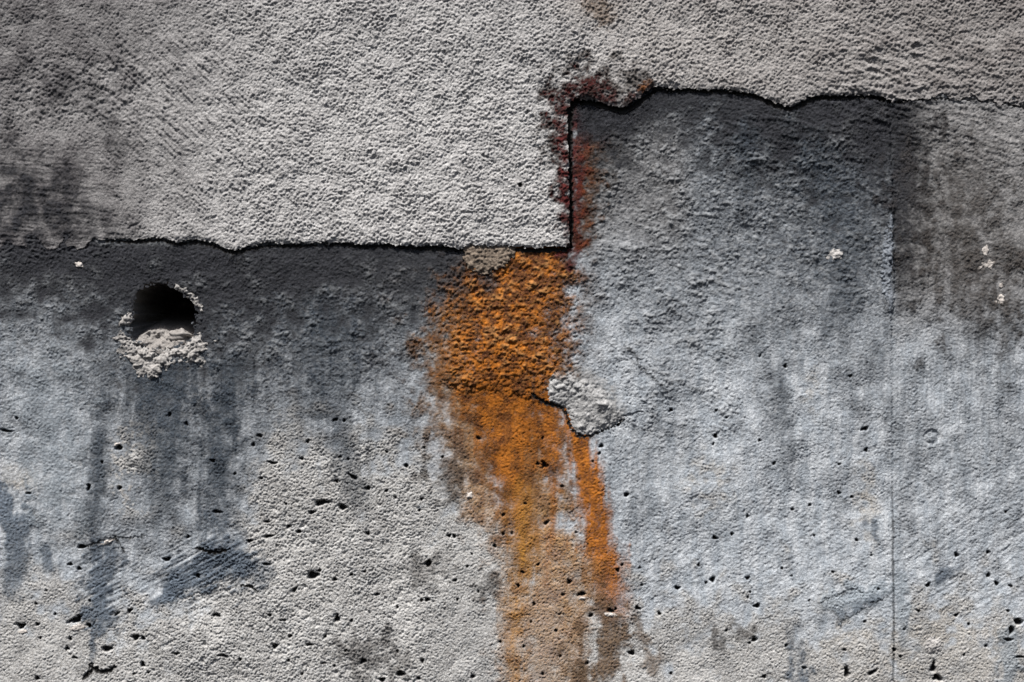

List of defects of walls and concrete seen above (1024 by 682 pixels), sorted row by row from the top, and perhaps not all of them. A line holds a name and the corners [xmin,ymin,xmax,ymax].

water stain [572,86,1024,314]
spalling [826,248,843,260]
spalling [880,213,895,313]
spalling [977,245,995,270]
spalling [112,279,217,383]
water stain [0,168,465,490]
corrosion [430,49,653,679]
water stain [88,428,105,520]
peeling [0,481,52,596]
peeling [66,529,133,658]
peeling [150,534,274,608]
peeling [999,610,1024,682]